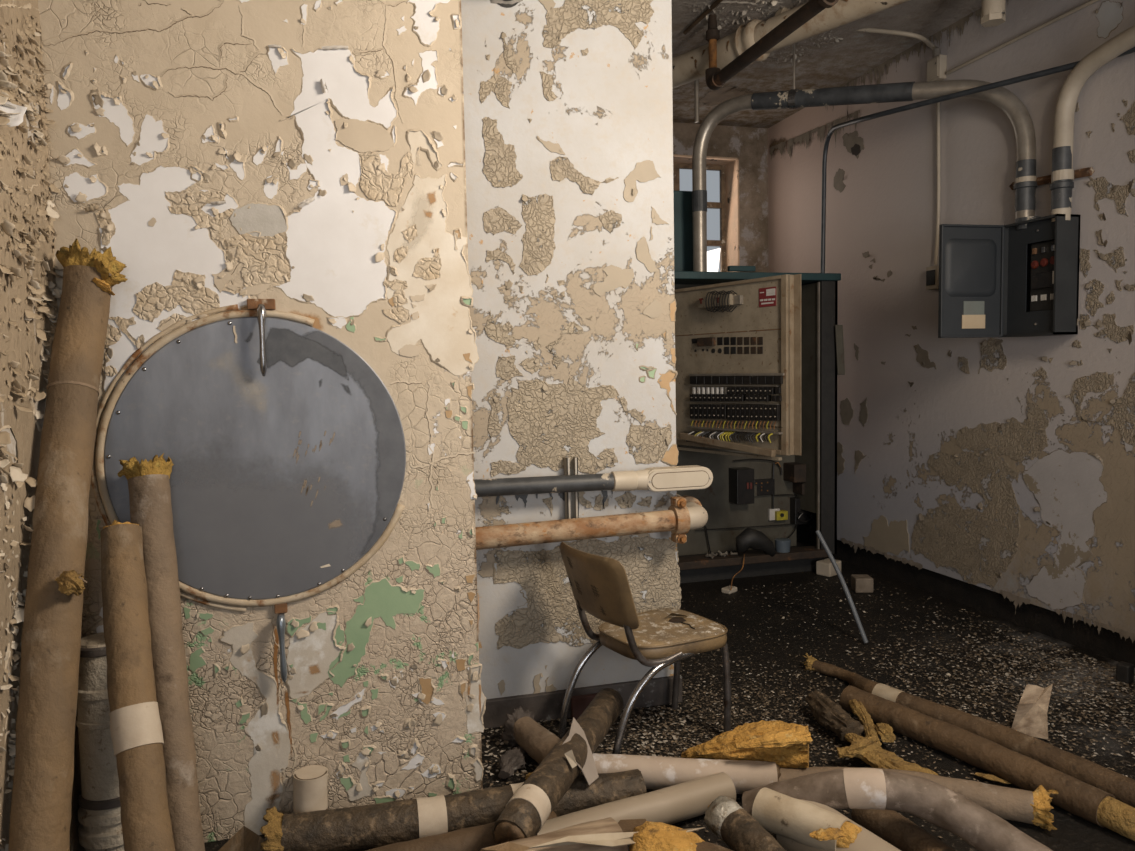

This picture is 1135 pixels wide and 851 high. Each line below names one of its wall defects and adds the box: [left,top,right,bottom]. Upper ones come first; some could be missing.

crack [44,0,284,115]
crack [353,0,407,124]
peeling [479,74,512,109]
spalling [490,0,523,8]
peeling [540,71,557,101]
peeling [683,0,810,38]
peeling [0,0,486,851]
peeling [497,490,652,516]
peeling [662,445,678,465]
peeling [1022,449,1108,610]
corrosion [272,628,292,753]
crack [271,606,297,783]